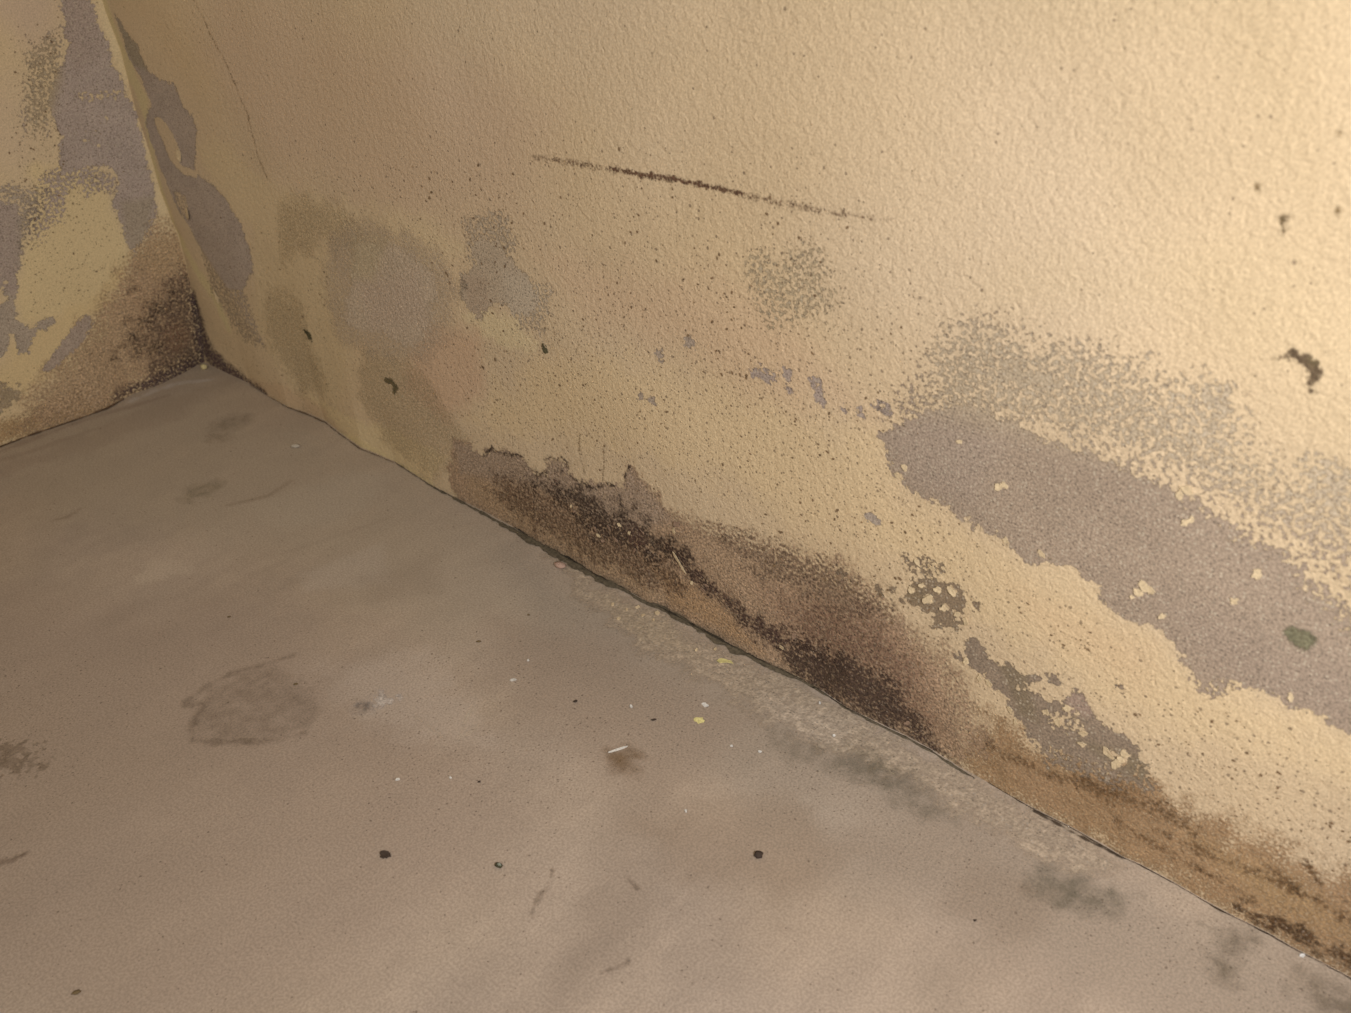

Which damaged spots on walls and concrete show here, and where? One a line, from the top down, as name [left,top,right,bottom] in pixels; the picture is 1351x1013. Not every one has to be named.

peeling [0,0,264,372]
peeling [0,381,21,414]
leakage [0,217,267,443]
leakage [665,237,766,419]
leakage [356,310,1116,873]
peeling [872,552,1160,795]
peeling [749,306,1351,735]
leakage [1179,703,1351,865]
leakage [1234,899,1351,968]